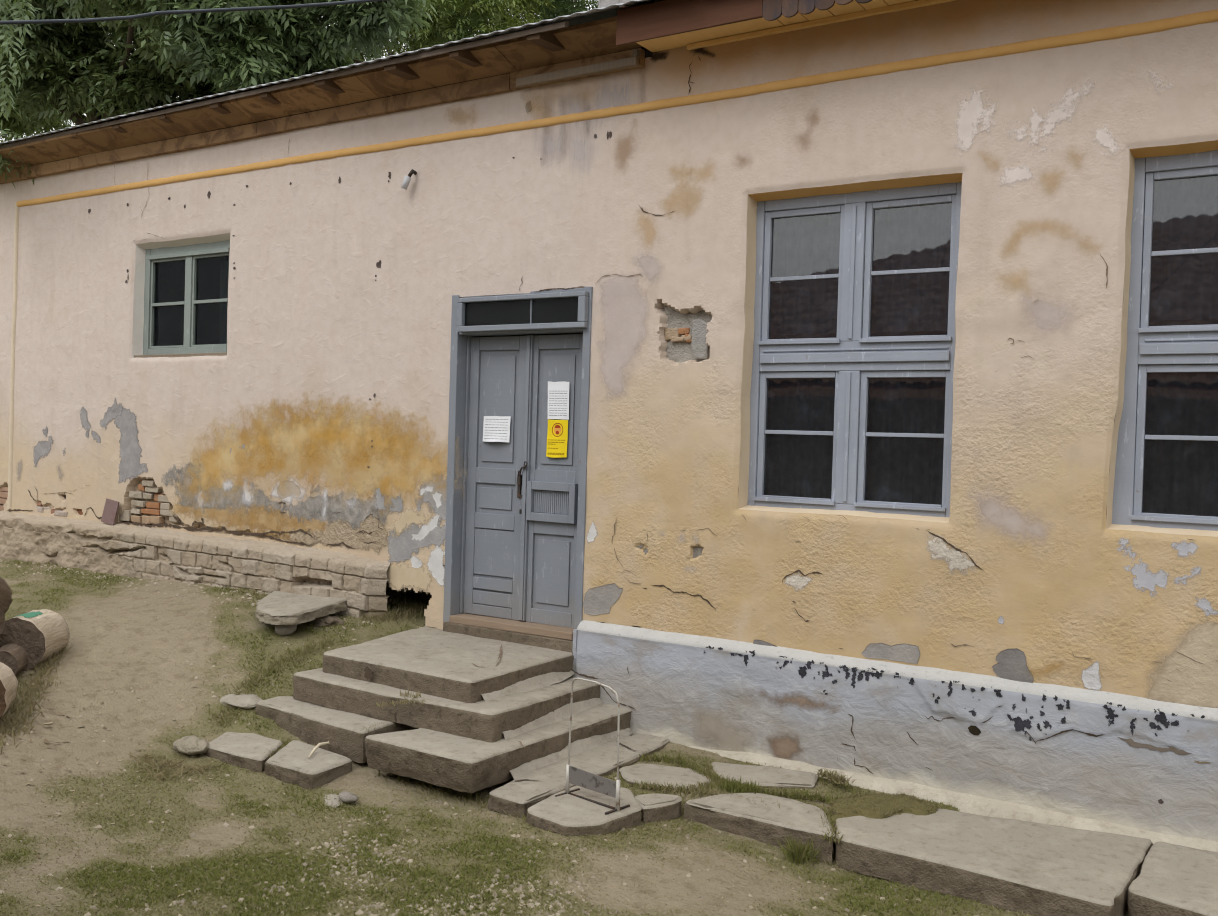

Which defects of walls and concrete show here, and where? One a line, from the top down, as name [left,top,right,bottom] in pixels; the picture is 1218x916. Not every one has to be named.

peeling [951,91,996,151]
flaking render [664,305,712,363]
peeling [0,427,65,511]
flaking render [80,398,184,524]
damp [161,403,447,541]
peeling [290,474,447,593]
flaking render [927,535,976,574]
peeling [1117,537,1201,597]
peeling [704,646,755,666]
peeling [775,656,915,695]
peeling [933,681,1070,741]
peeling [1081,662,1205,737]